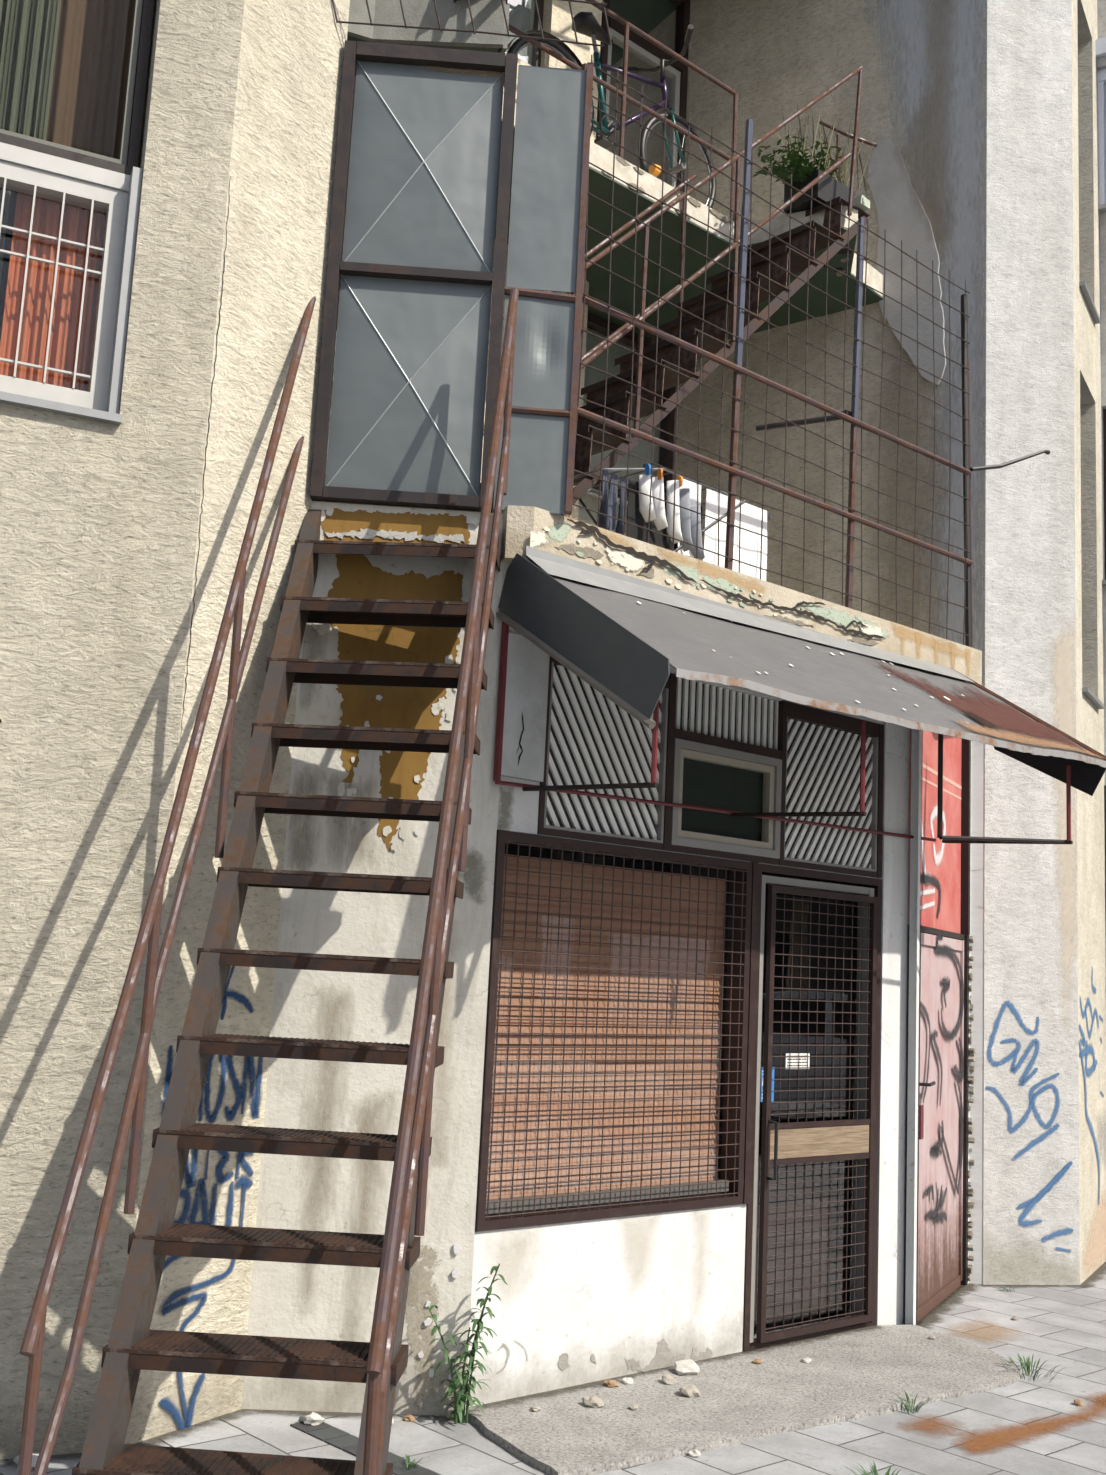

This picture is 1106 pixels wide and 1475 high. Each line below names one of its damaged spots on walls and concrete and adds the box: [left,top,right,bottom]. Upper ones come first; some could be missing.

peeling [320,506,479,602]
peeling [530,523,890,645]
corrosion [665,554,761,591]
peeling [312,623,460,664]
peeling [332,684,457,730]
corrosion [875,627,1105,759]
peeling [337,749,431,800]
peeling [377,819,420,852]
corrosion [914,1418,945,1430]
corrosion [961,1395,1106,1453]